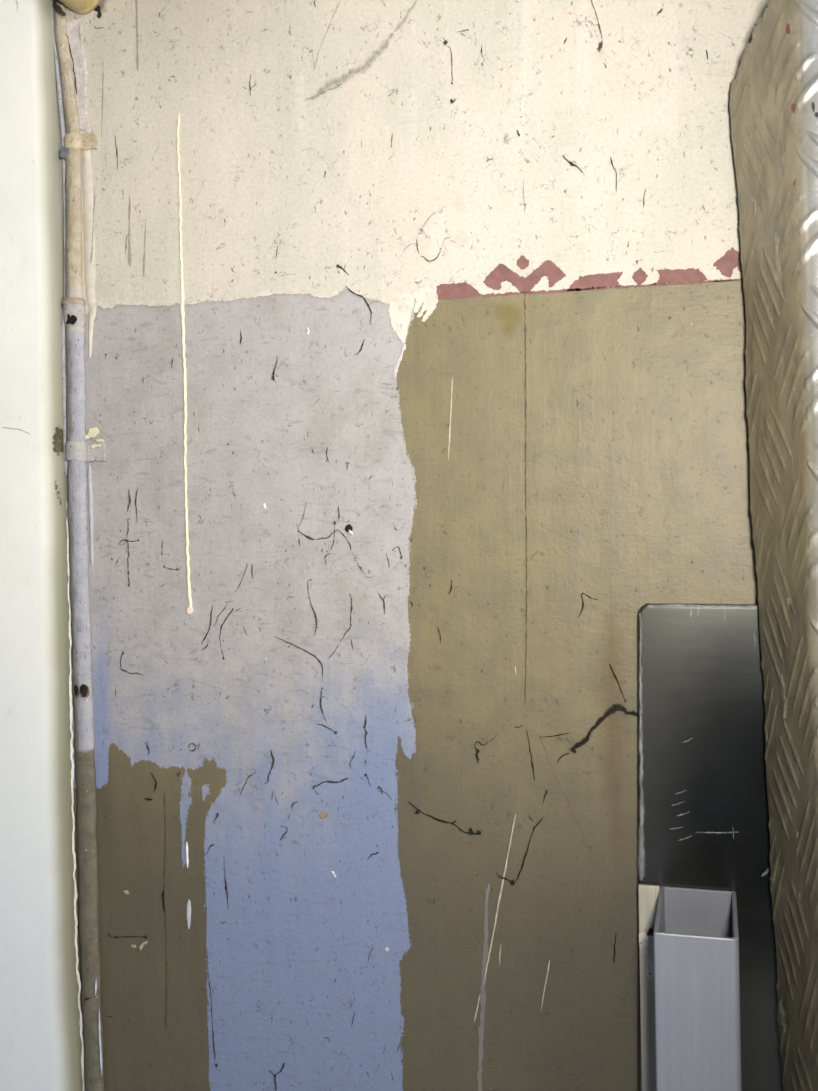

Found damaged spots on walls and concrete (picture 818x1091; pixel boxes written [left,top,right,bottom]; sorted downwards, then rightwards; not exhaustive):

peeling [66,19,90,132]
peeling [94,288,338,309]
peeling [376,284,438,377]
crack [521,306,529,699]
crack [240,501,481,840]
crack [474,664,638,885]